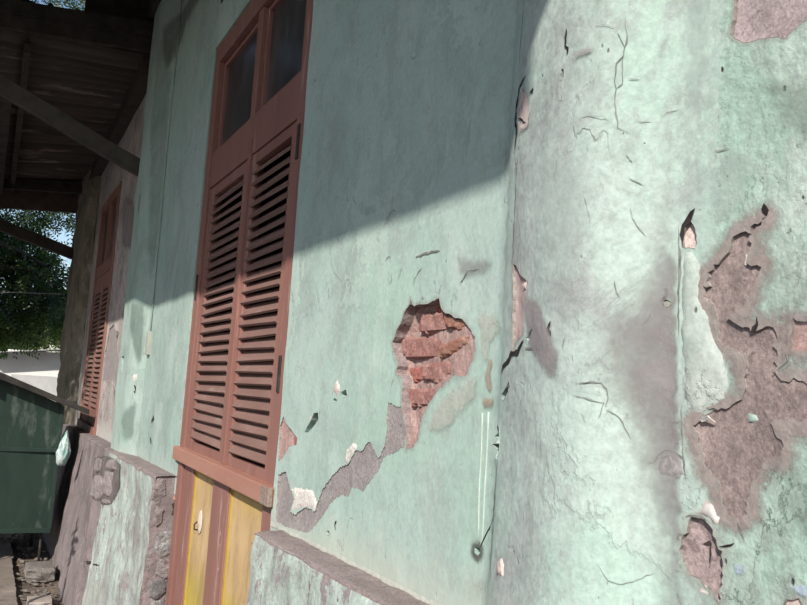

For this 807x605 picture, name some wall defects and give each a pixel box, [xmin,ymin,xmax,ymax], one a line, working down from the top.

spalling [730,0,807,43]
leakage [518,89,529,130]
spalling [512,264,532,351]
leakage [524,298,557,375]
leakage [638,297,679,457]
spalling [677,203,807,603]
spalling [270,298,476,605]
peeling [496,558,504,577]